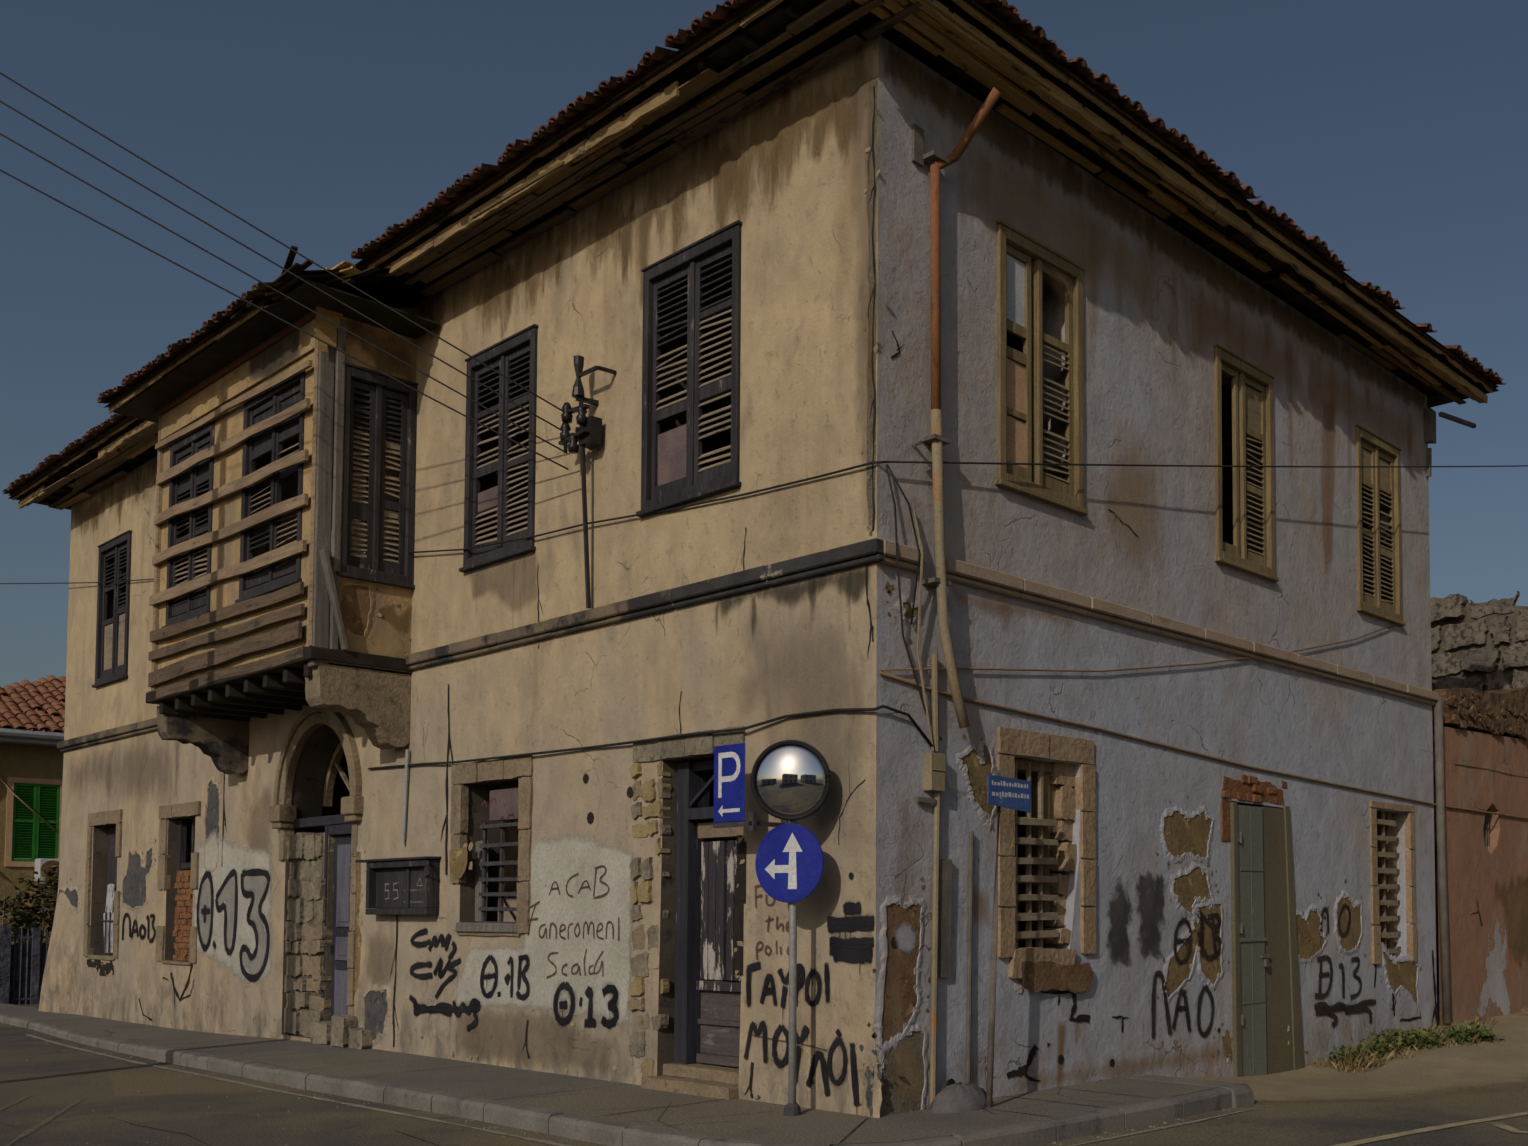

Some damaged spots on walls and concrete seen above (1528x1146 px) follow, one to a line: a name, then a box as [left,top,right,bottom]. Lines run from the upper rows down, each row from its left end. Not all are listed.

damp [429,51,869,330]
damp [886,47,1424,409]
peeling [955,735,997,832]
peeling [858,877,931,1118]
peeling [1014,959,1093,995]
peeling [1156,796,1229,1006]
peeling [1295,879,1422,1012]